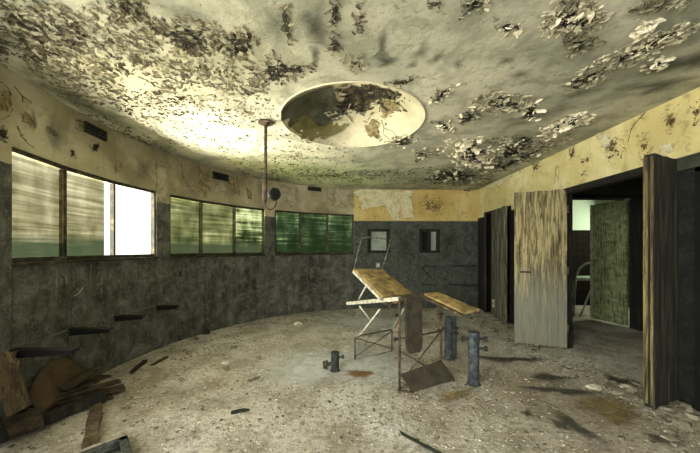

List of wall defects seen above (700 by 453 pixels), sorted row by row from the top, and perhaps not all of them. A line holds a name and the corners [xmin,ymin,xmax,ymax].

peeling [0,0,597,221]
peeling [537,0,700,90]